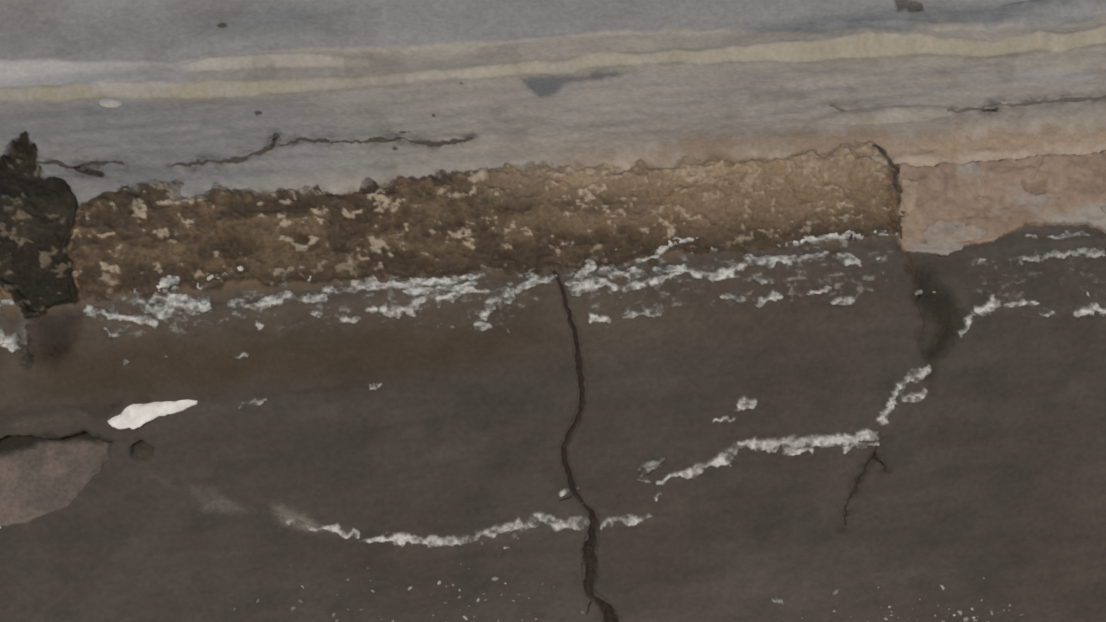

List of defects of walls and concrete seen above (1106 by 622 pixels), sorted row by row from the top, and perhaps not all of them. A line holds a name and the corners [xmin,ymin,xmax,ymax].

leakage [83,230,898,338]
spalling [0,116,1106,328]
leakage [1010,230,1106,266]
leakage [0,298,71,367]
spalling [0,436,111,529]
flaking render [108,399,197,460]
crack [548,263,621,622]
leakage [637,276,1055,501]
crack [844,440,887,526]
leakage [272,504,653,556]
leakage [880,585,1024,622]